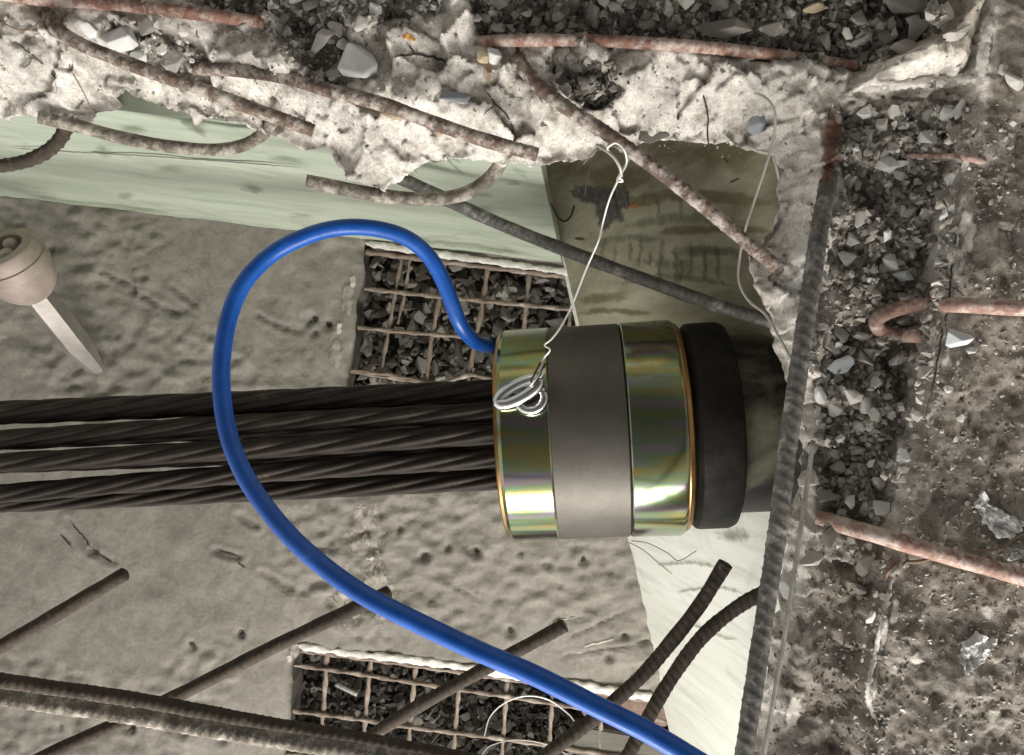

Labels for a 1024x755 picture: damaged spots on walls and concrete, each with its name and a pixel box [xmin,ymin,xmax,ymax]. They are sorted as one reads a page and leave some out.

spalling [0,0,772,338]
spalling [312,249,493,384]
spalling [474,11,1024,755]
corrosion [821,112,846,182]